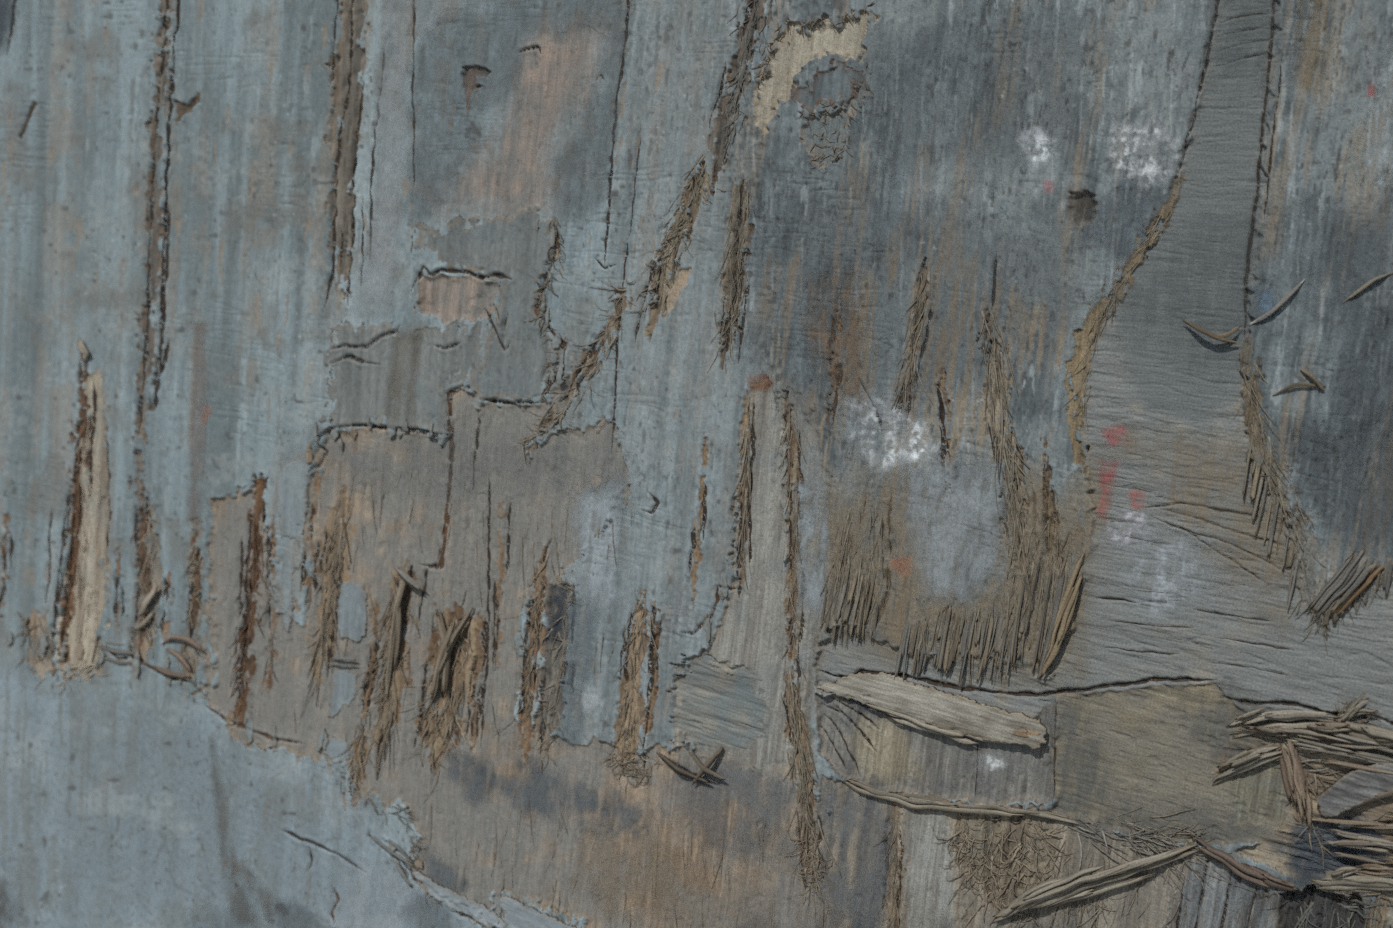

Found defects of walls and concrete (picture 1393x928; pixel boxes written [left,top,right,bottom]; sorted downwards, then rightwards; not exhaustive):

spalling [745,1,879,173]
spalling [1069,191,1098,226]
peeling [13,369,167,696]
crack [0,0,379,795]
crack [305,0,687,755]
crack [829,281,950,470]
crack [620,404,1393,891]